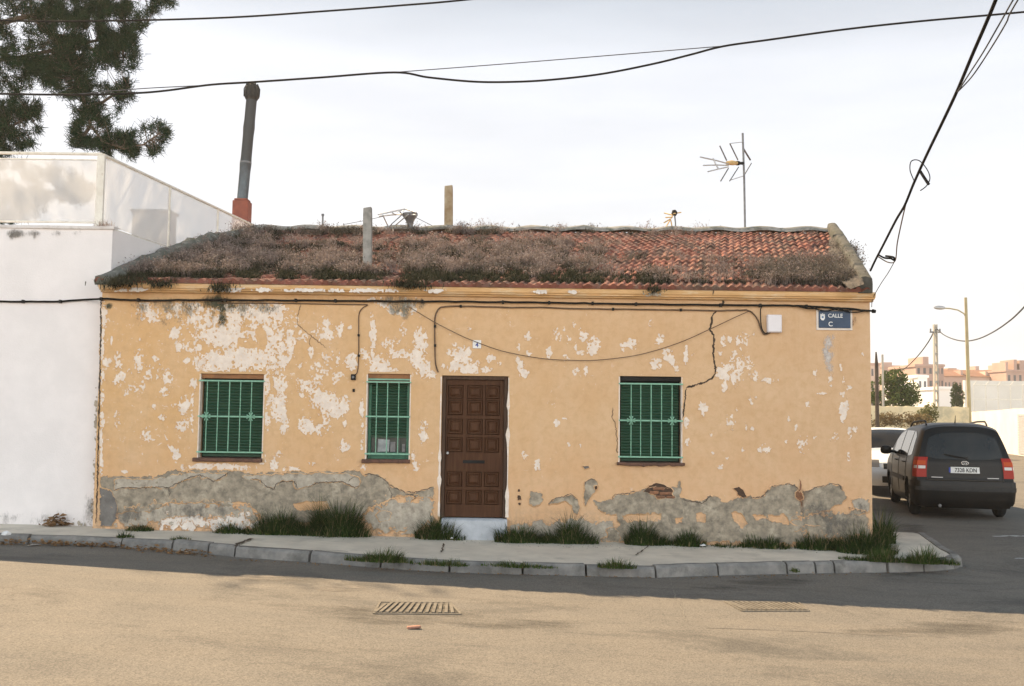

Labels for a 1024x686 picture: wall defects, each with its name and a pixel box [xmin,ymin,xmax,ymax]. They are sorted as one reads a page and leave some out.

peeling [619,337,639,353]
peeling [648,318,695,375]
crack [682,290,725,418]
peeling [715,331,779,406]
flaking render [65,287,602,536]
peeling [683,401,709,447]
peeling [741,363,858,462]
flaking render [510,465,871,546]